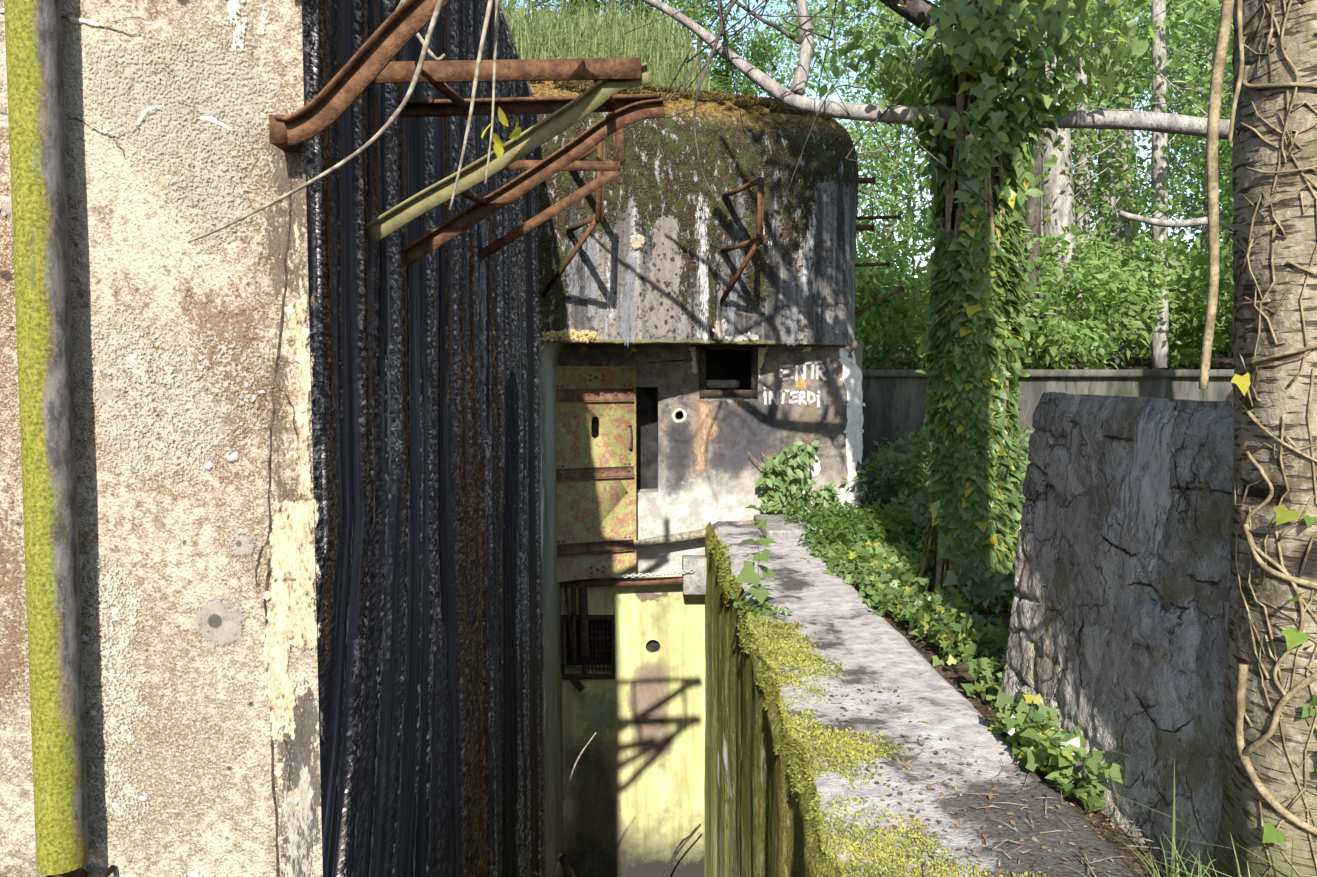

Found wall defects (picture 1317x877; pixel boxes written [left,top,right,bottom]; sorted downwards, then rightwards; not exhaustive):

crack [61,16,154,38]
peeling [838,348,866,503]
peeling [262,278,321,742]
damp [476,193,817,877]
peeling [274,763,304,813]